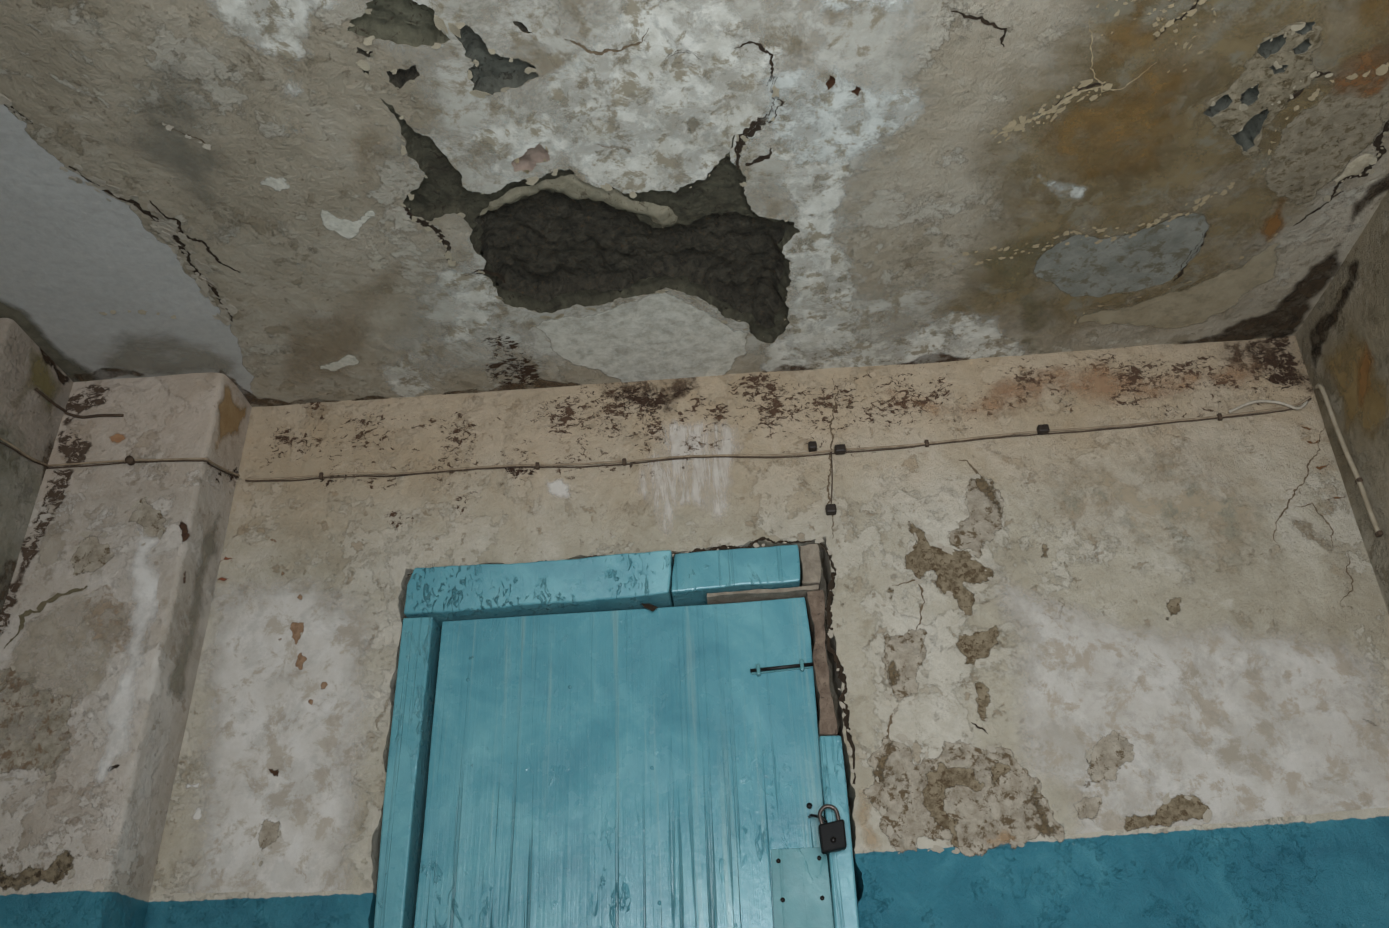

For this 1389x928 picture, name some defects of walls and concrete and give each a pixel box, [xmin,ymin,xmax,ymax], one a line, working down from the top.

peeling [990,0,1216,143]
spalling [347,0,800,343]
leakage [0,0,1389,635]
peeling [936,182,1279,328]
crack [1273,427,1354,606]
crack [0,585,88,692]
peeling [863,460,1213,857]
peeling [0,845,83,896]